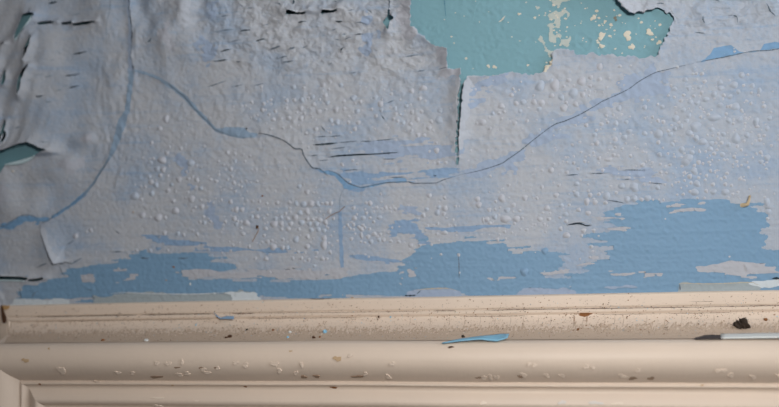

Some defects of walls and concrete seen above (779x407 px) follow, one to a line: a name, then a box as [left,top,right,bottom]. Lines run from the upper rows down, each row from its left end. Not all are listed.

crack [701,42,779,62]
peeling [410,0,674,165]
crack [0,0,680,267]
crack [37,289,131,322]
crack [152,313,190,321]
crack [233,311,360,319]
crack [430,309,551,325]
crack [573,308,624,326]
crack [644,284,735,323]